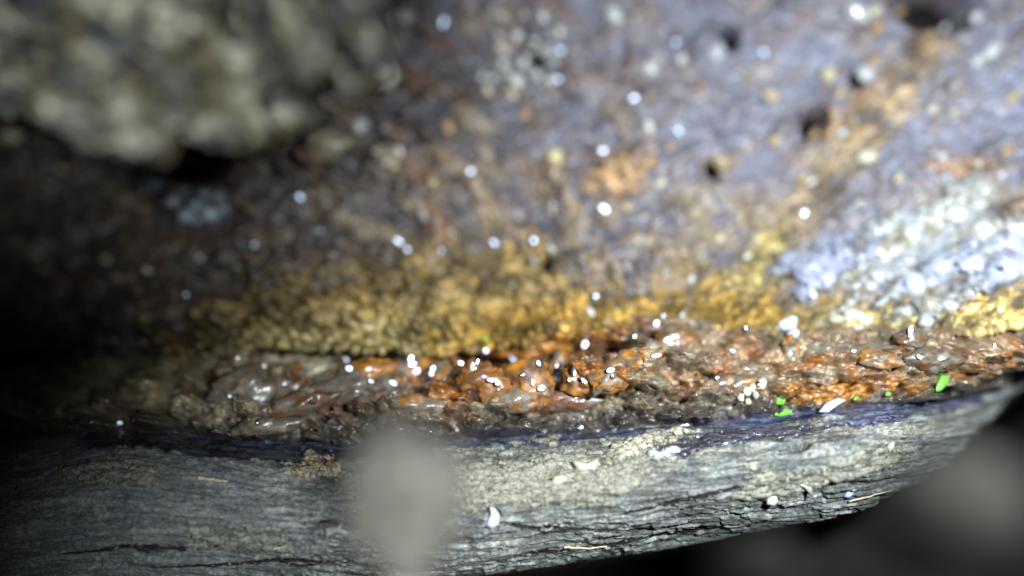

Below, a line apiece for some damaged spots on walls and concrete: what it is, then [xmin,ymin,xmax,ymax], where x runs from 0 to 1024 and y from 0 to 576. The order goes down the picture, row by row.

corrosion [0,28,1024,445]
crack [59,543,350,569]